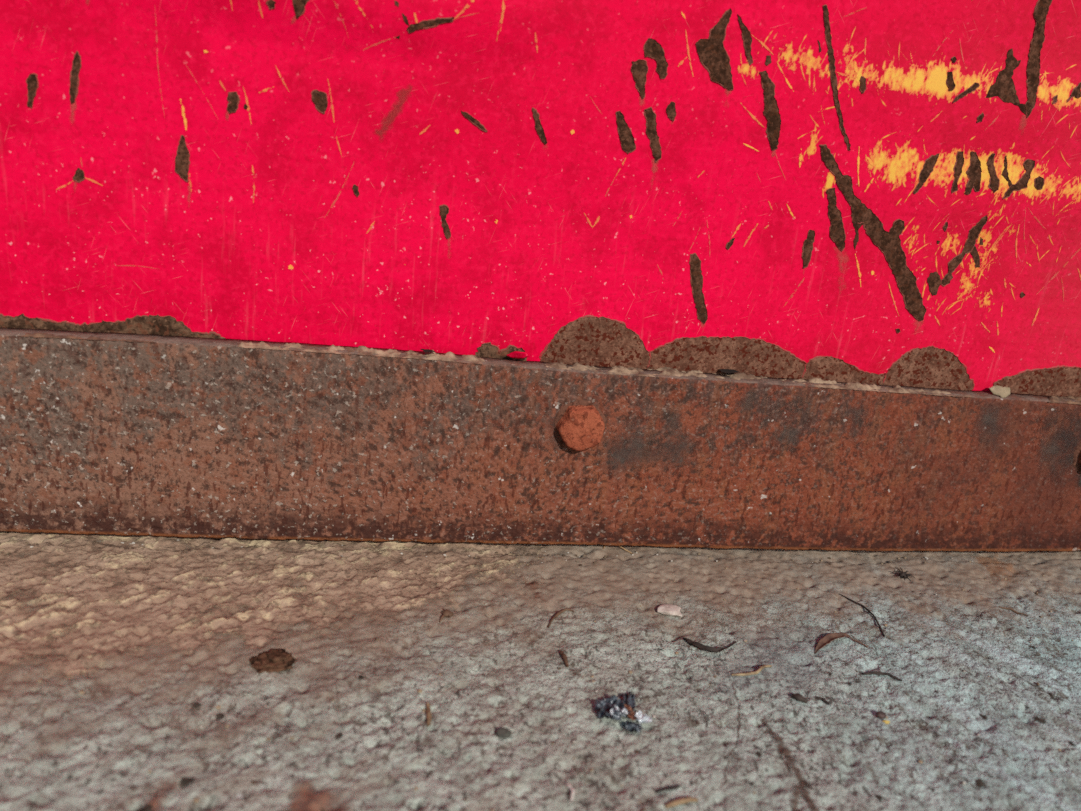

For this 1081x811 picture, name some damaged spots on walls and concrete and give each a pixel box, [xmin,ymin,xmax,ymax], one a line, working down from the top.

peeling [69,51,82,119]
peeling [175,135,191,197]
peeling [616,38,676,172]
peeling [695,0,1081,326]
peeling [0,253,975,397]
peeling [989,365,1081,405]
corrosion [0,327,1081,660]
corrosion [78,632,245,687]